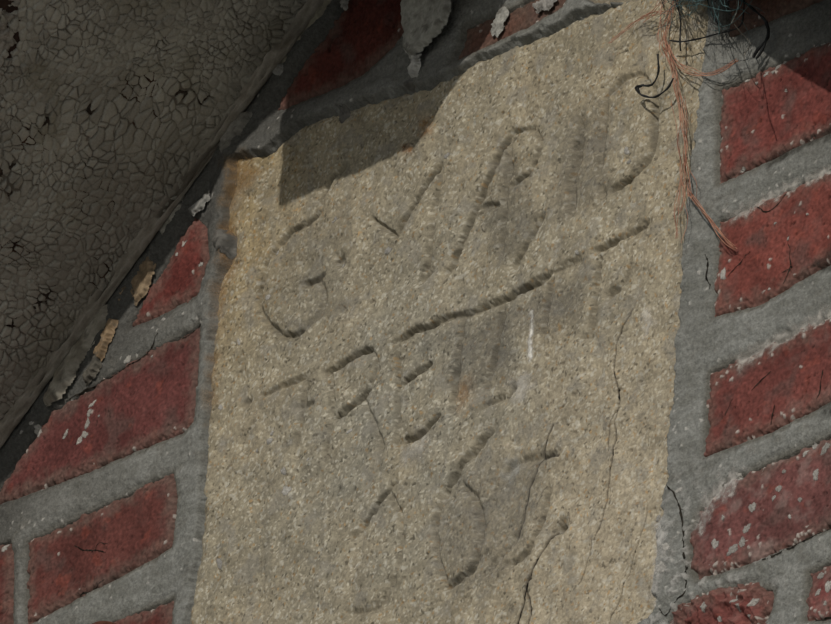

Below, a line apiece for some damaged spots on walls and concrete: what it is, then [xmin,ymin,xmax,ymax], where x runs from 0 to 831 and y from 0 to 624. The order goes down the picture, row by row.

peeling [0,0,27,58]
peeling [400,0,451,78]
crack [66,332,158,401]
crack [519,439,557,536]
crack [518,534,559,624]
crack [659,478,688,622]